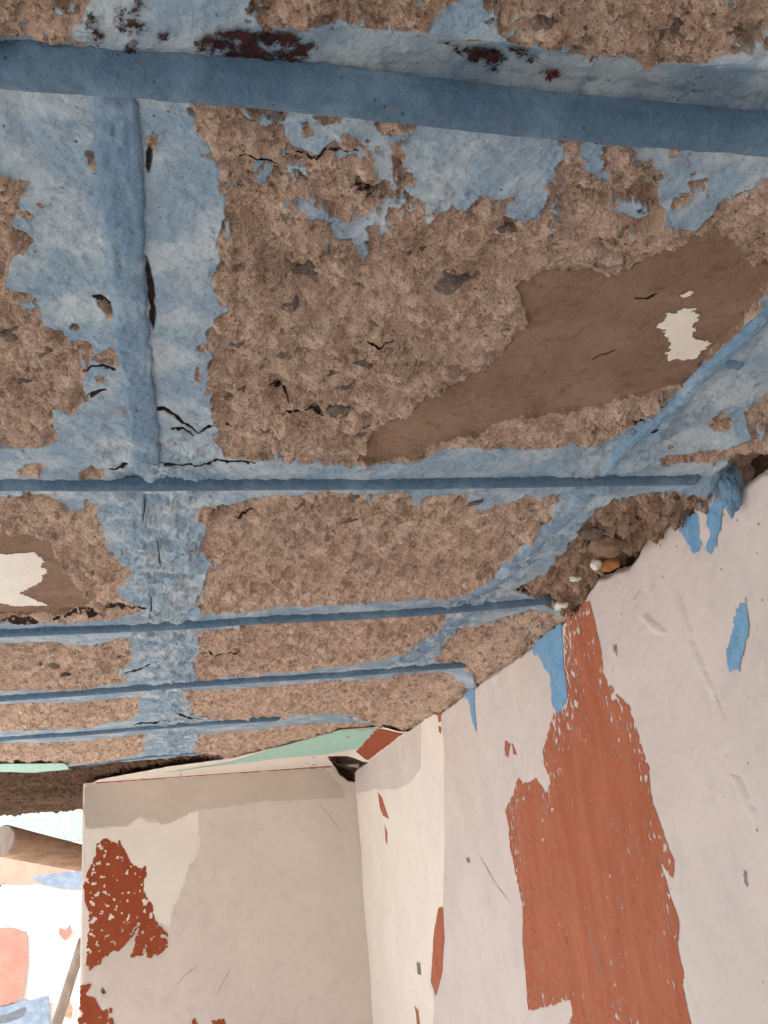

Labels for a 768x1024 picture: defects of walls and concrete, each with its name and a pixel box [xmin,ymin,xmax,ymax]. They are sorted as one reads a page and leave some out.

rust [539,68,561,82]
spalling [85,151,97,173]
crack [145,146,153,173]
spalling [0,175,120,449]
crack [145,256,156,330]
spalling [187,103,768,469]
crack [157,406,232,436]
spalling [660,394,768,484]
peeling [0,491,713,1024]